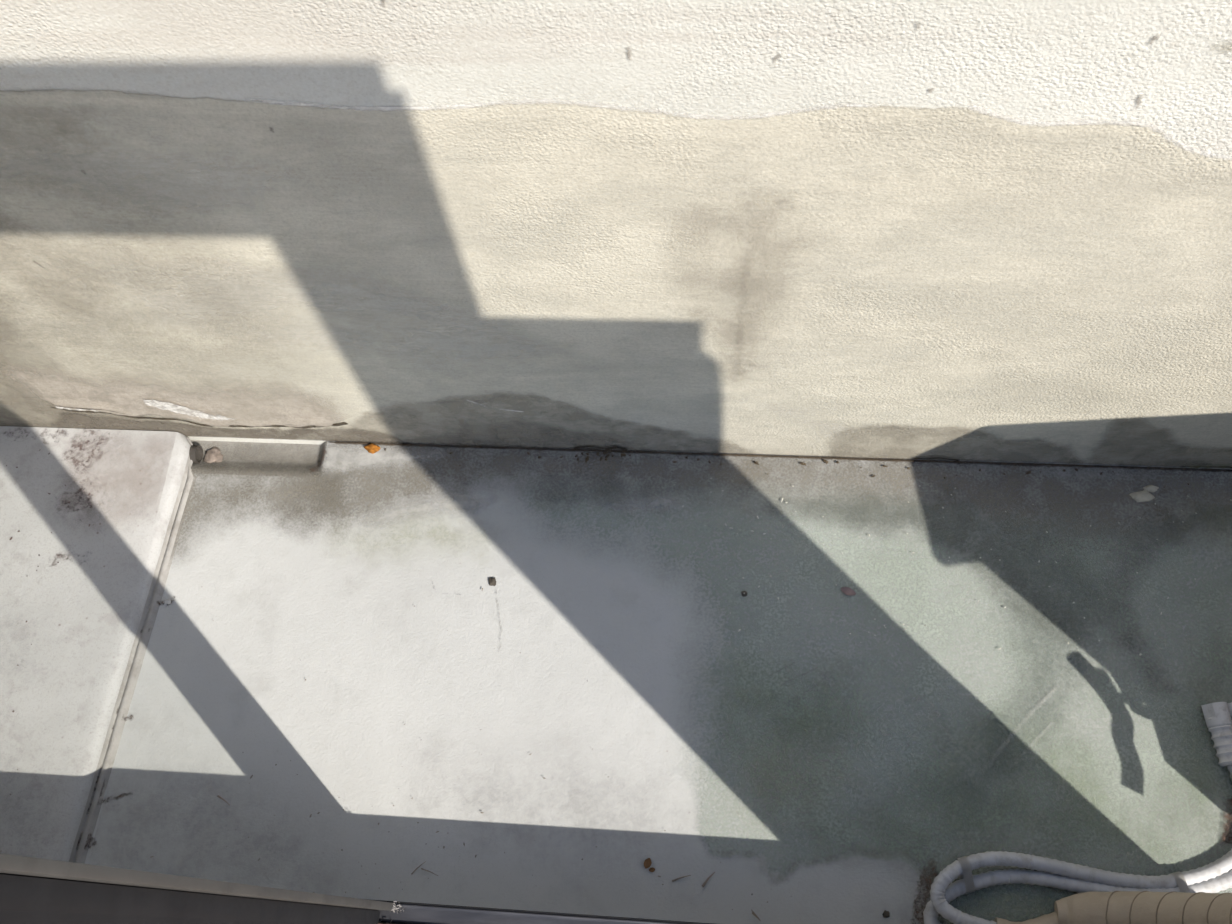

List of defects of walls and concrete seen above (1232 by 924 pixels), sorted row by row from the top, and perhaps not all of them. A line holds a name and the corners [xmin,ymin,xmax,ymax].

peeling [10,369,403,443]
water stain [0,90,1232,720]